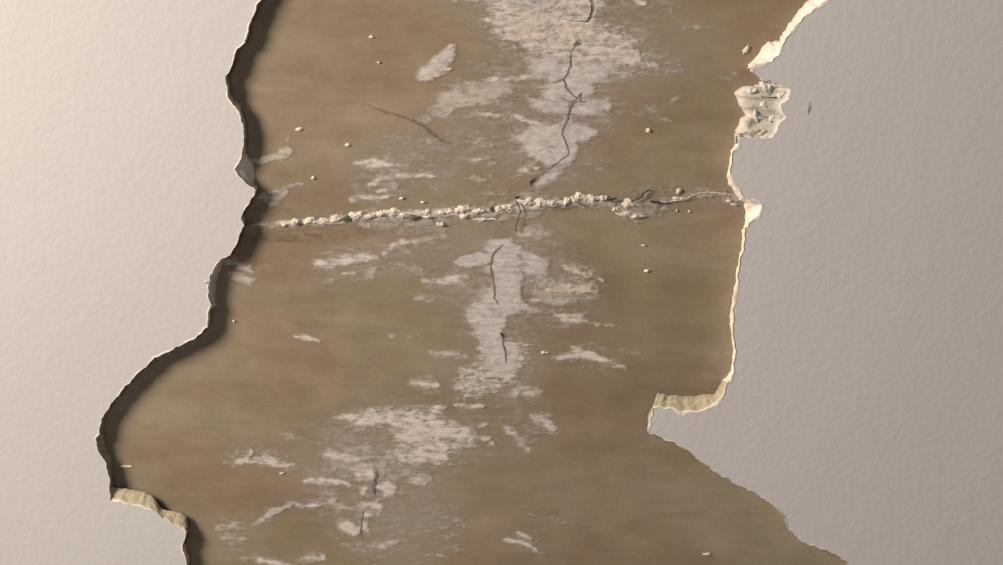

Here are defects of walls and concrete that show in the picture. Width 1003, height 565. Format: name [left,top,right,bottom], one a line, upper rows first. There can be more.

water stain [420,0,663,189]
crack [244,0,743,305]
efflorescence [349,153,449,202]
spalling [95,0,849,565]
efflorescence [555,346,626,369]
efflorescence [296,226,607,549]
efflorescence [232,449,294,468]
crack [360,470,378,536]
water stain [215,522,249,558]
water stain [257,557,290,565]
efflorescence [504,531,543,554]